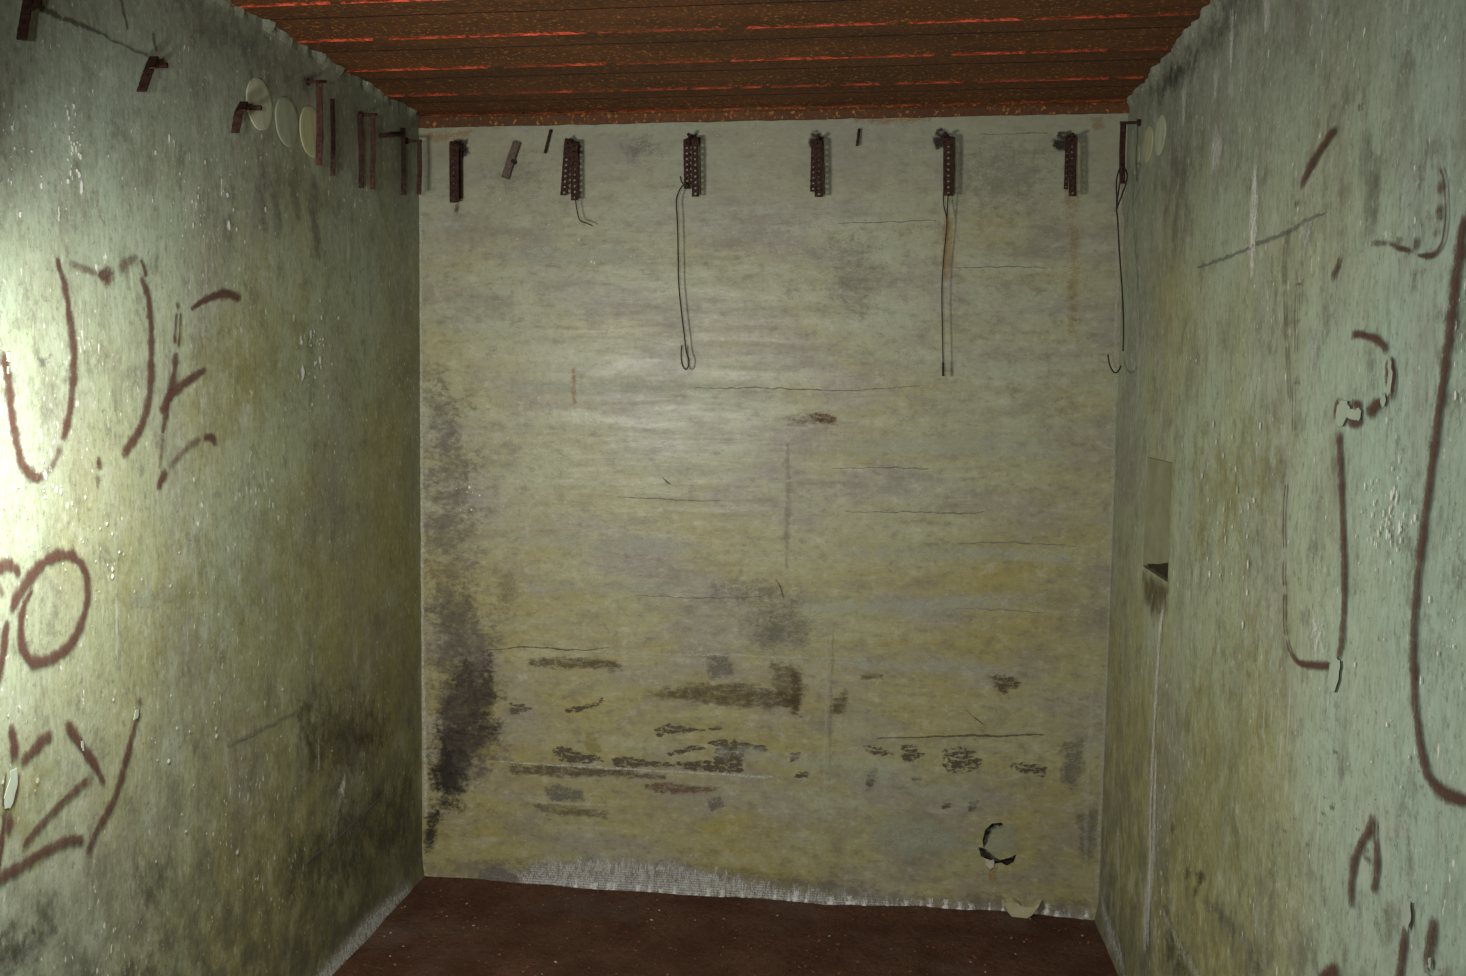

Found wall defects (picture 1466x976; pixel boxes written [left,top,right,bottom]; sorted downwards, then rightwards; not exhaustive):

water stain [529,657,618,669]
water stain [656,655,800,714]
water stain [991,675,1020,696]
water stain [424,651,500,852]
water stain [511,765,723,811]